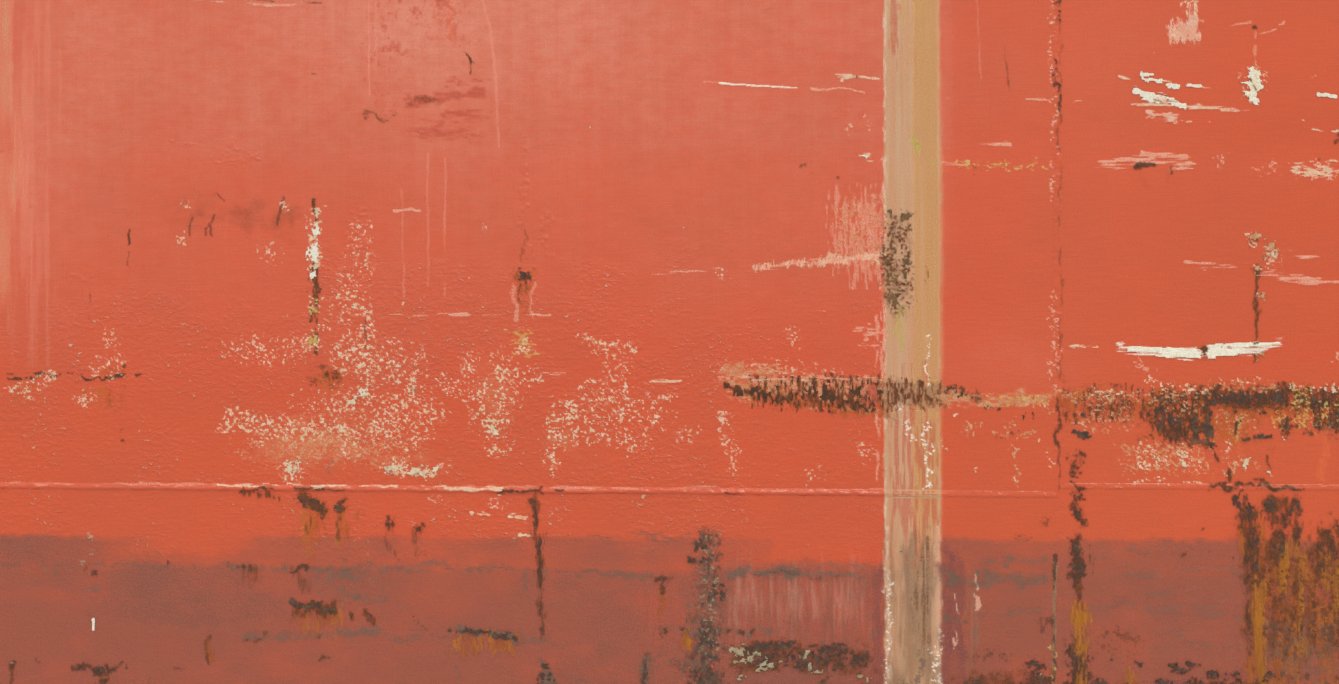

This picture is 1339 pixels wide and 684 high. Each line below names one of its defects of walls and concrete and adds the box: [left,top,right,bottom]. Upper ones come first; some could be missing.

peeling [1118,71,1229,124]
peeling [1241,66,1264,105]
corrosion [879,209,913,341]
corrosion [723,296,1339,473]
peeling [1127,342,1281,359]
corrosion [1245,233,1338,362]
corrosion [294,487,359,543]
corrosion [284,564,375,633]
corrosion [497,486,564,636]
corrosion [716,572,885,684]
corrosion [937,546,1058,684]
corrosion [1155,481,1339,684]